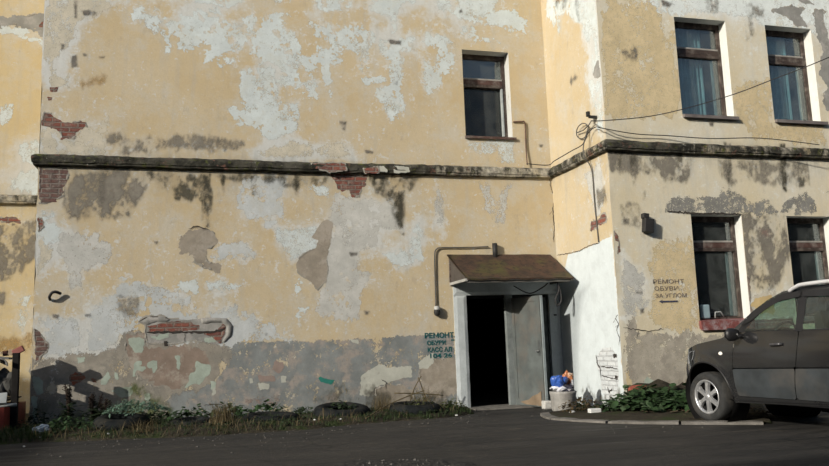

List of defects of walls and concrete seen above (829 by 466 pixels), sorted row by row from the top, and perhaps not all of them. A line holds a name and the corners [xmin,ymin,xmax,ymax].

peeling [0,0,117,100]
peeling [546,0,829,147]
peeling [10,112,112,290]
water stain [64,169,146,219]
water stain [174,174,212,212]
water stain [163,135,244,151]
peeling [130,0,455,322]
crack [549,179,599,256]
water stain [607,152,690,182]
water stain [723,158,808,191]
flaking render [17,226,293,425]
flaking render [596,230,725,400]